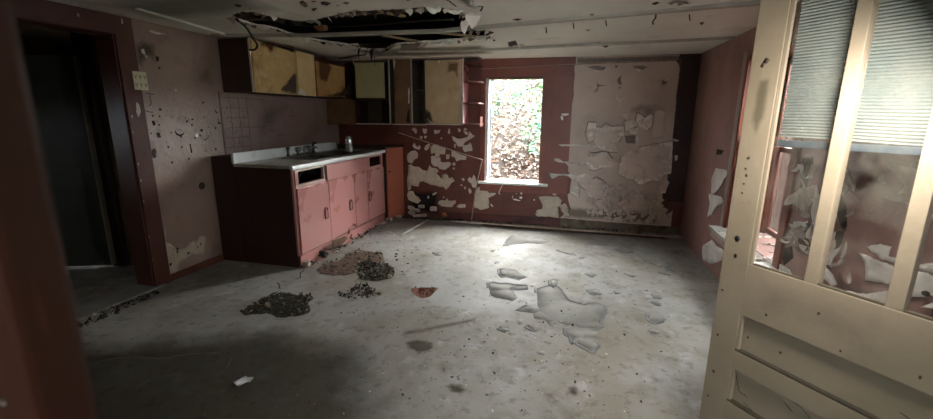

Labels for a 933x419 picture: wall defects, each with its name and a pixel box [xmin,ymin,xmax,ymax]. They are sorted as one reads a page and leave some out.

peeling [300,1,349,11]
peeling [407,128,496,210]
peeling [550,112,679,200]
peeling [534,194,570,218]
peeling [767,157,820,274]
peeling [882,192,911,208]
peeling [164,229,207,274]